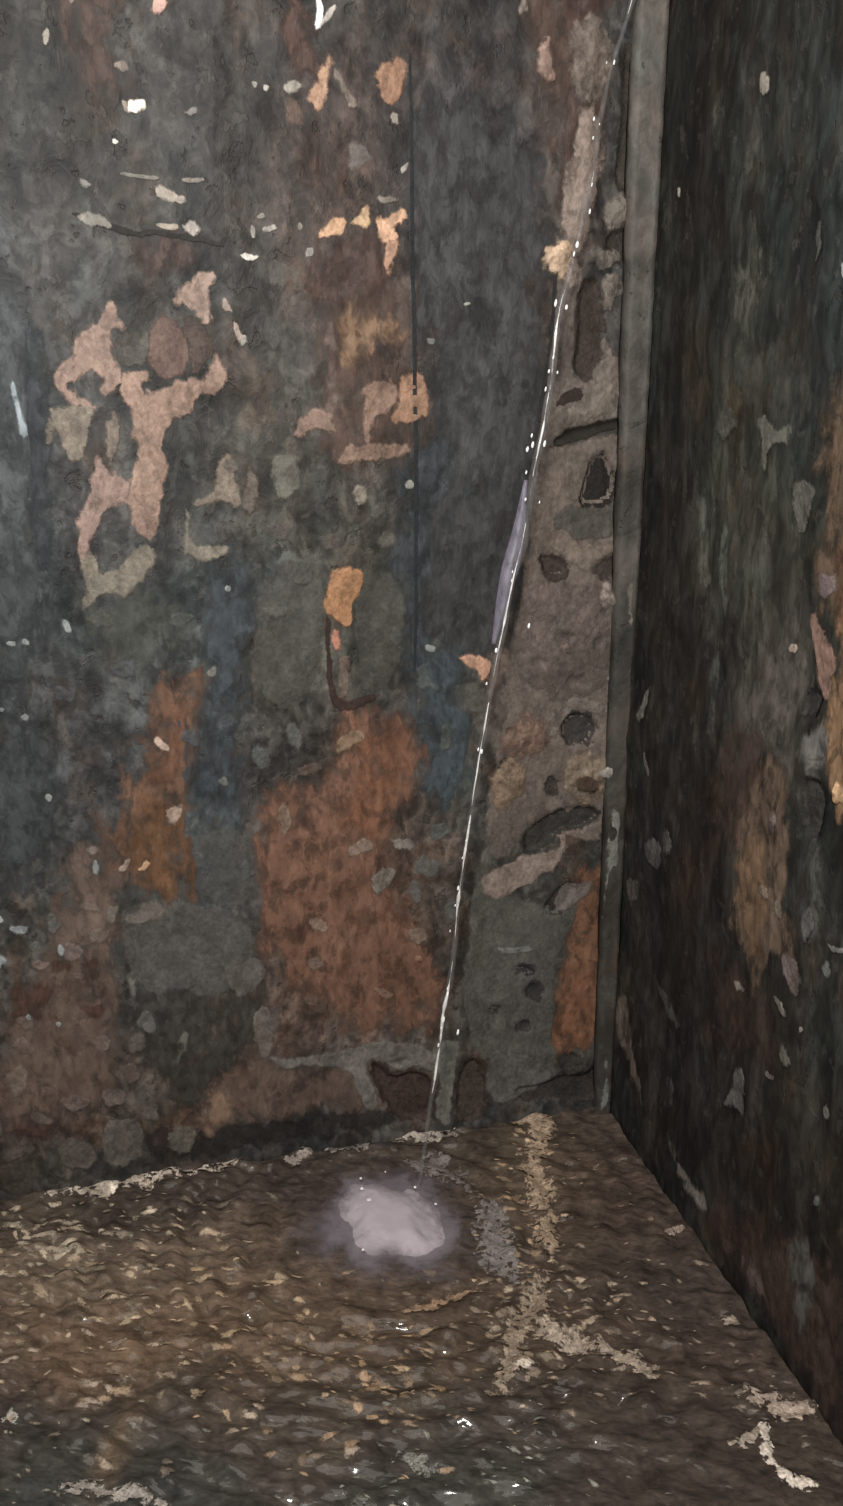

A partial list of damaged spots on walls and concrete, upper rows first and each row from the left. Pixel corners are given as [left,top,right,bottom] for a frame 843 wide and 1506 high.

peeling [252,56,357,124]
peeling [376,57,407,124]
peeling [241,196,407,291]
crack [409,53,418,670]
crack [538,271,617,446]
peeling [46,271,247,628]
peeling [294,372,429,464]
peeling [445,275,617,1124]
damp [604,810,620,899]
damp [0,916,27,934]
damp [0,971,659,1396]
damp [664,1224,685,1236]